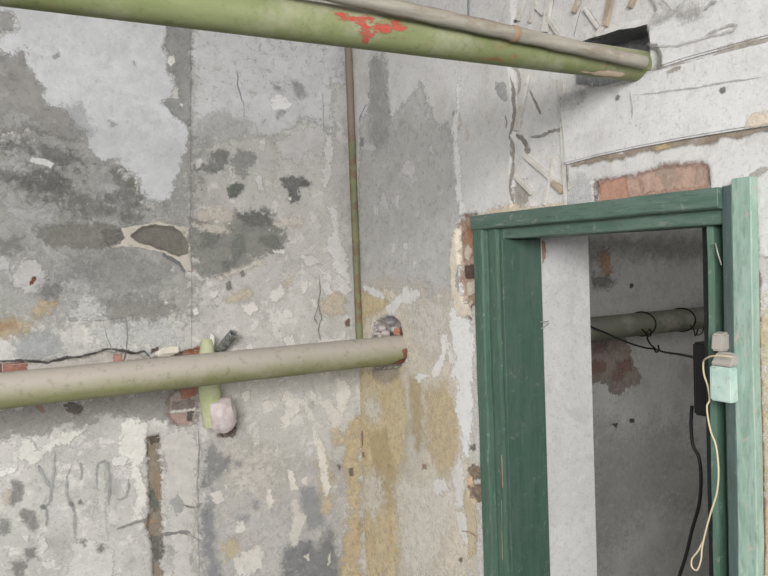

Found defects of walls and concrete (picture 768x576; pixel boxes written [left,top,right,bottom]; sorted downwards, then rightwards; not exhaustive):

spalling [584,24,651,56]
spalling [576,70,625,86]
spalling [593,161,710,201]
crack [566,127,768,202]
damp [0,125,304,361]
spalling [111,221,193,272]
crack [1,317,150,364]
peeling [301,53,482,562]
damp [359,275,483,576]
peeling [160,387,202,576]